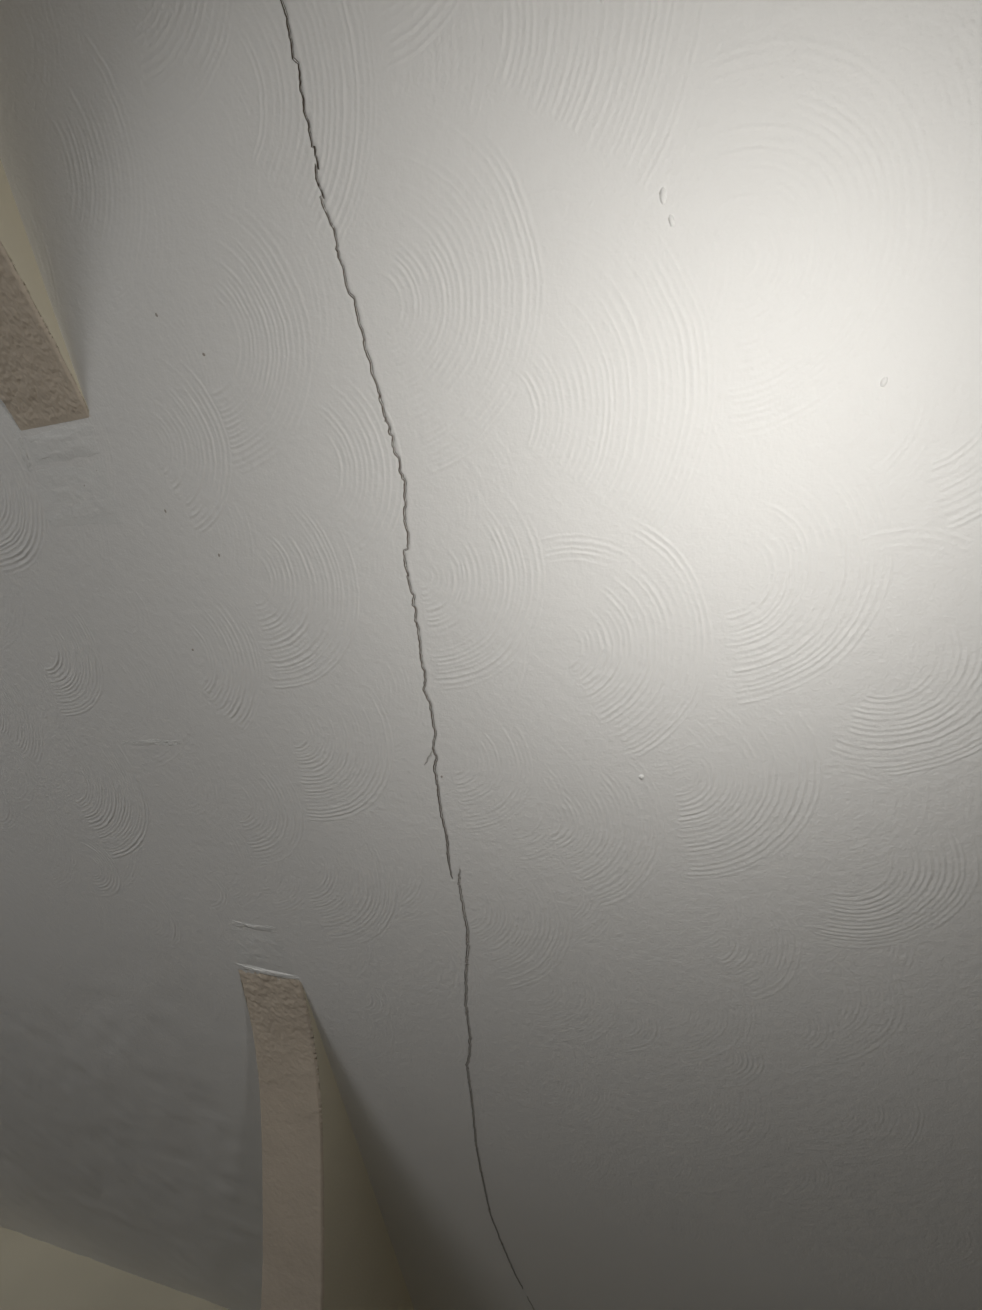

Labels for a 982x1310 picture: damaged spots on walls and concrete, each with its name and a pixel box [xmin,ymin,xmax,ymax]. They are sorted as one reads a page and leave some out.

crack [280,0,535,1310]